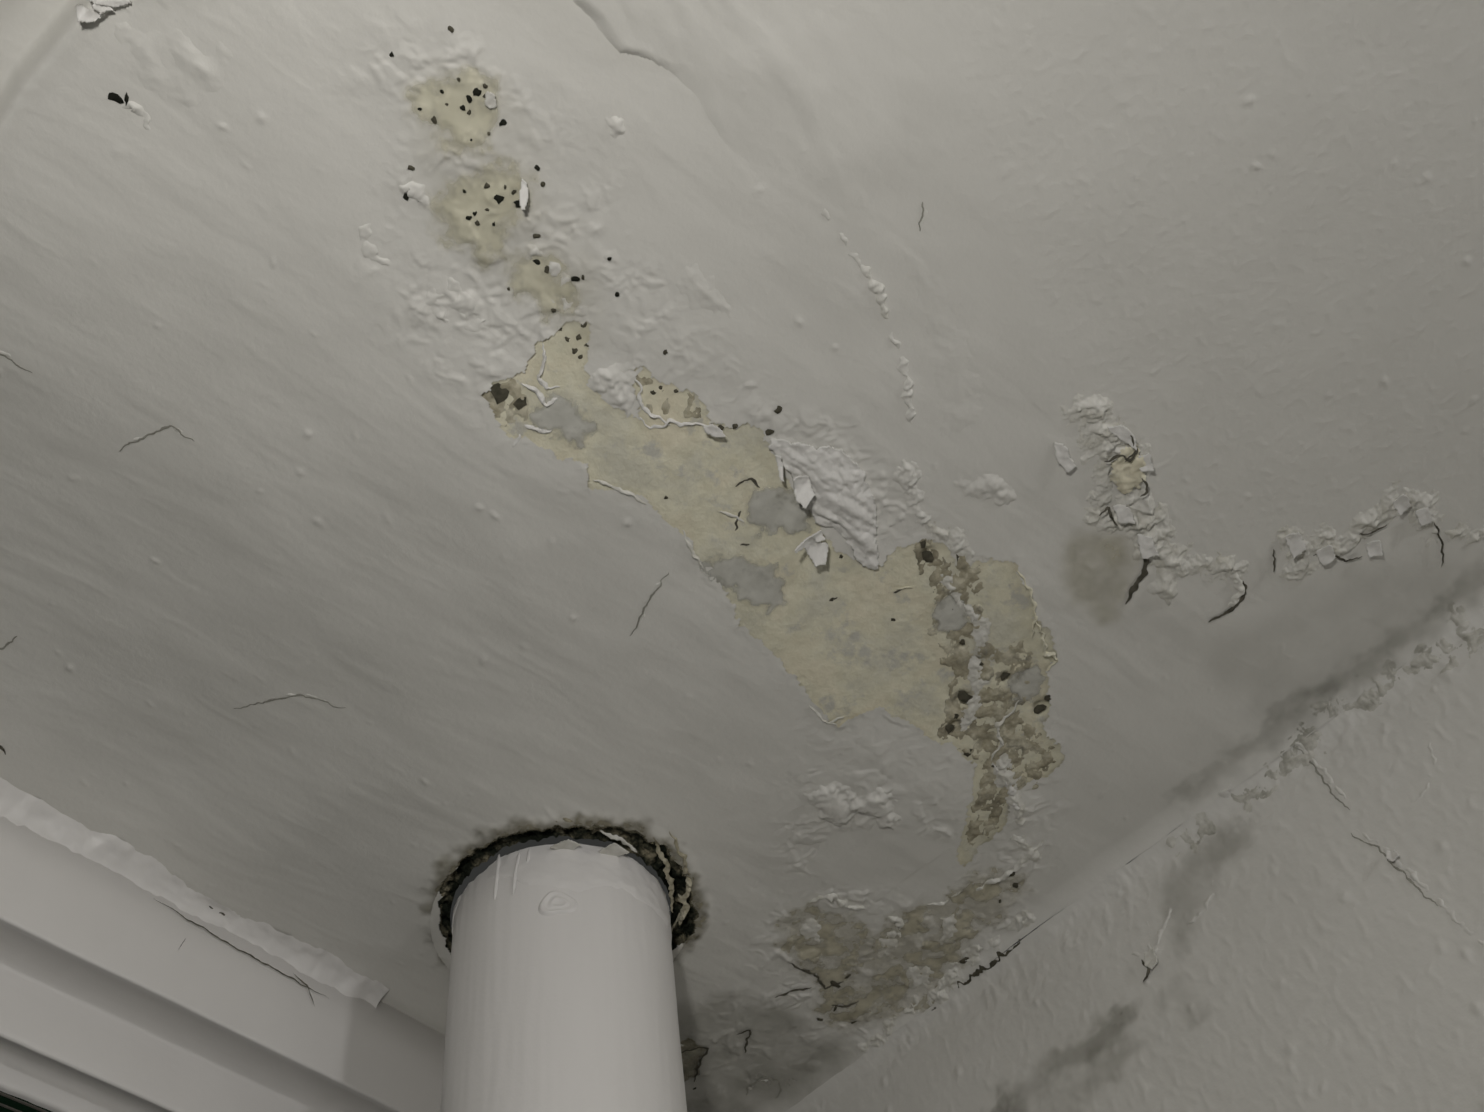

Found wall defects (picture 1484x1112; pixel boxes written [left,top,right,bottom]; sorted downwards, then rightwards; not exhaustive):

peeling [75,0,131,23]
peeling [407,68,507,151]
peeling [398,159,545,266]
peeling [1053,390,1249,622]
peeling [1270,479,1484,585]
peeling [481,208,1065,1024]
peeling [680,1038,709,1090]